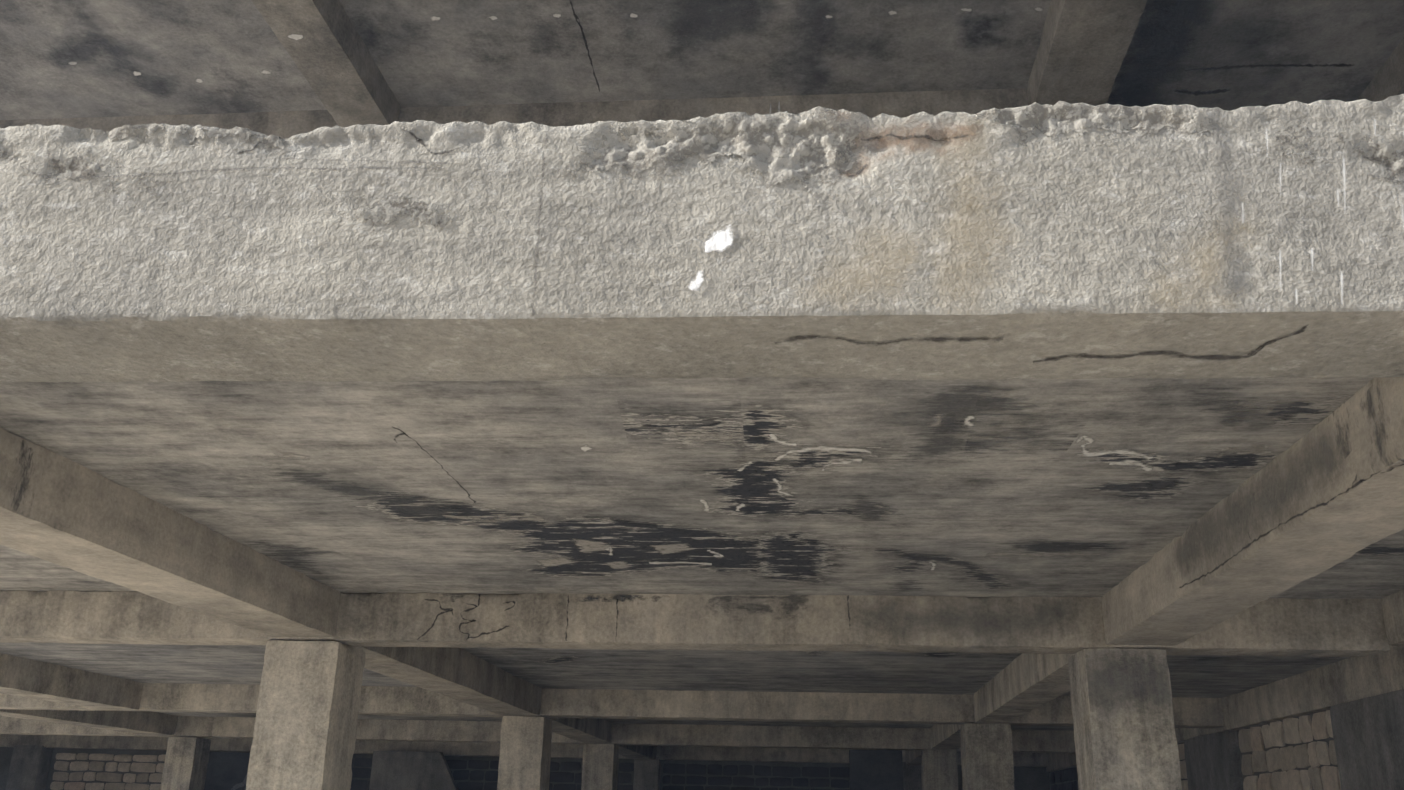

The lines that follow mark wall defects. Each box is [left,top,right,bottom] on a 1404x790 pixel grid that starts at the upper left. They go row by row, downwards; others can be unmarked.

crack [570,1,600,91]
crack [775,335,1003,345]
crack [1033,326,1306,363]
water stain [276,401,903,612]
water stain [896,386,1389,569]
crack [417,594,515,640]